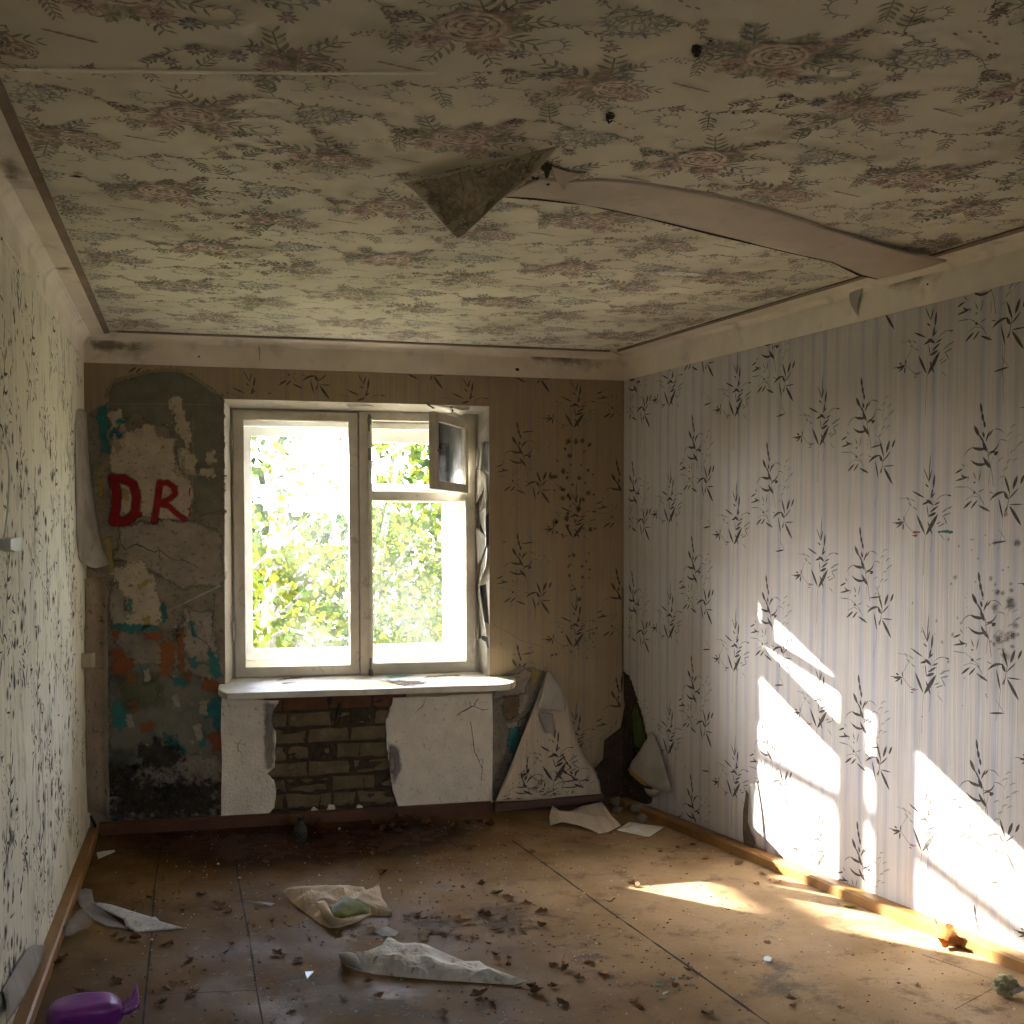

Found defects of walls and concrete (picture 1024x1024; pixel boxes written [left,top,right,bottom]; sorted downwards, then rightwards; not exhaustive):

mould [105,734,221,821]
peeling [75,368,566,820]